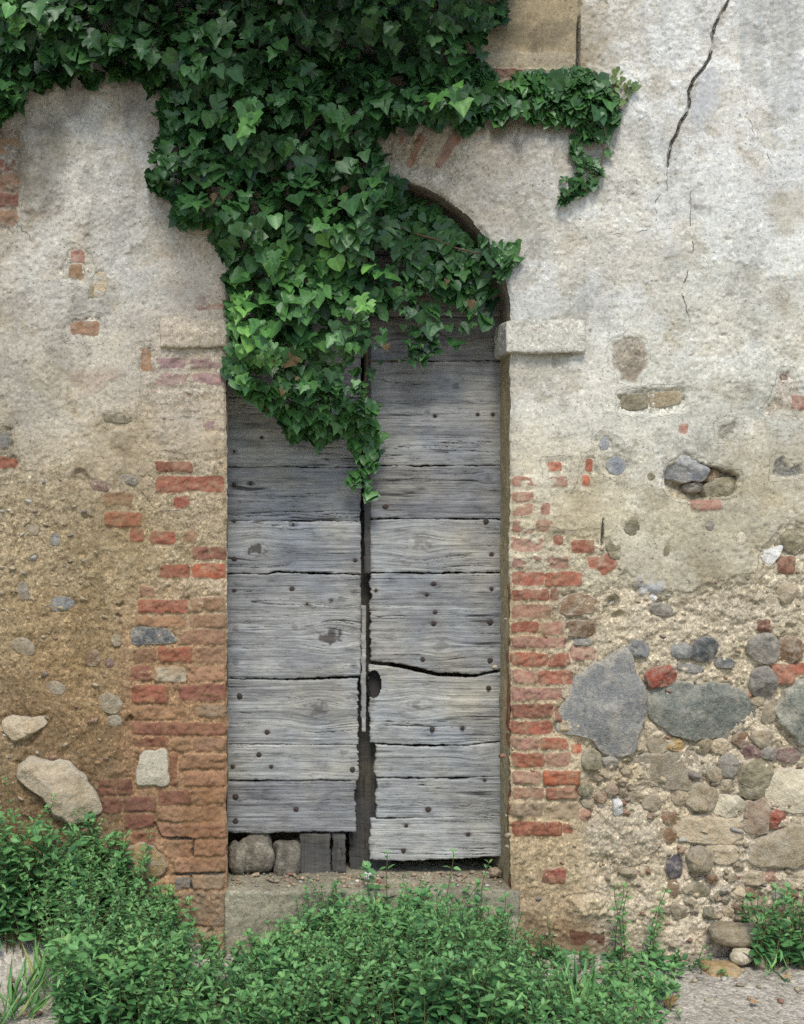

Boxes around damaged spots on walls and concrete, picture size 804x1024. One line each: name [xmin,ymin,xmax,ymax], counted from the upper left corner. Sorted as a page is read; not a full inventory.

crack [613,0,729,322]
spalling [540,427,632,494]
flaking render [647,456,736,497]
spalling [768,452,804,482]
spalling [0,423,229,950]
spalling [509,519,804,957]